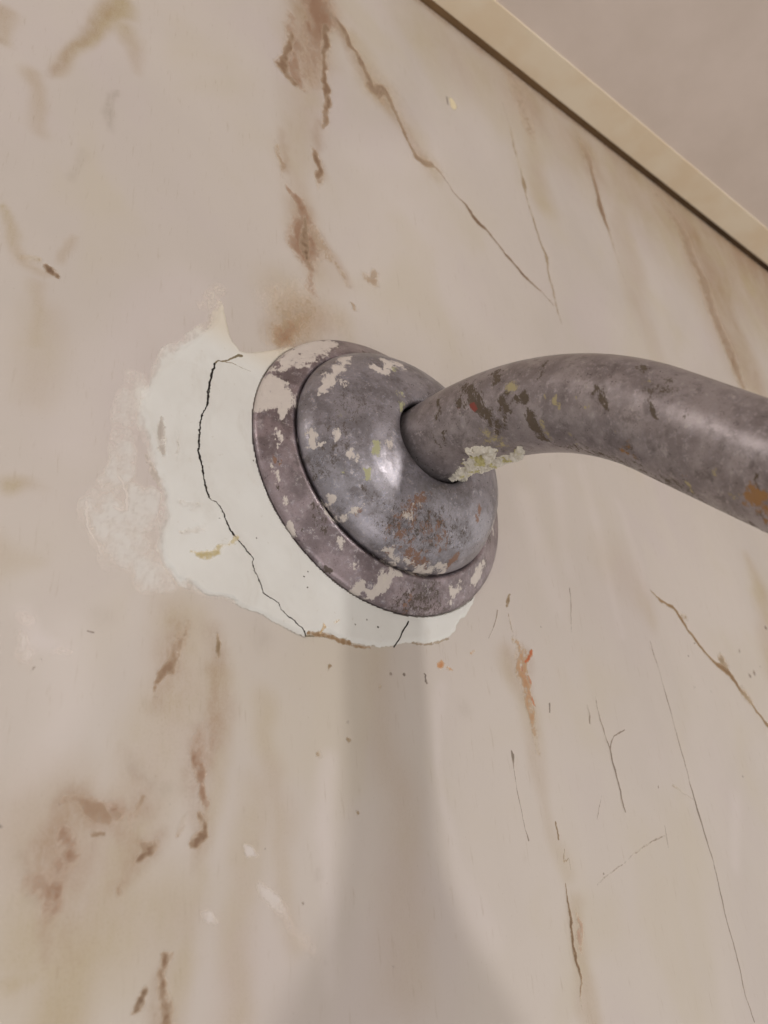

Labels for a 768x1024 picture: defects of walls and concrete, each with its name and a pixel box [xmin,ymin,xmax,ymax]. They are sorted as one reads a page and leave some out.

damp [275,0,549,300]
crack [512,137,558,312]
crack [197,354,326,638]
peeling [135,287,475,648]
rust [515,640,536,736]
crack [589,711,626,812]
crack [665,692,755,1023]
crack [653,593,768,727]